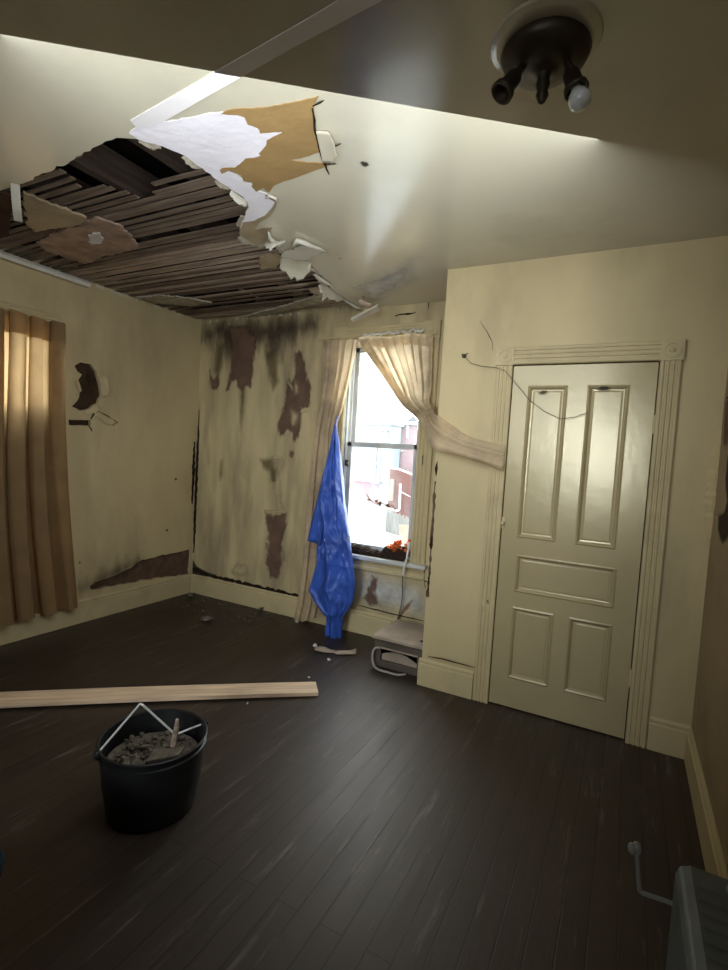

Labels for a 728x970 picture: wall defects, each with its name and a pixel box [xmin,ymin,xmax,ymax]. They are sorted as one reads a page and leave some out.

peeling [129,96,363,311]
damp [205,322,233,374]
peeling [210,326,256,390]
damp [244,319,315,386]
hole [69,363,118,431]
peeling [277,351,311,458]
flaking render [703,399,728,542]
peeling [264,509,286,578]